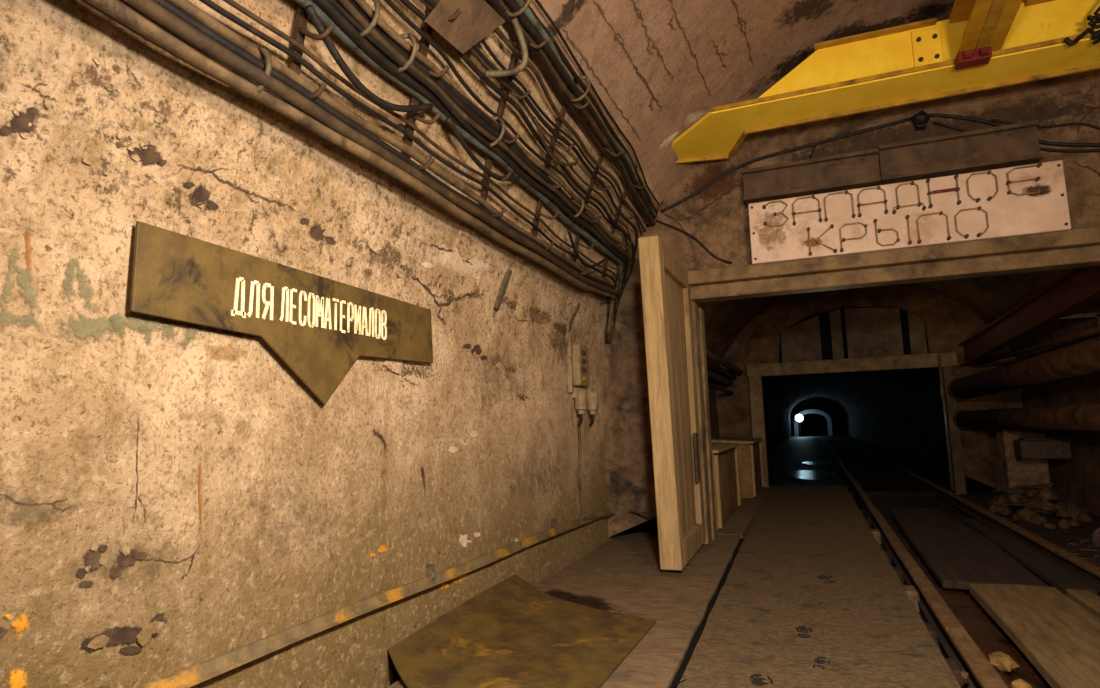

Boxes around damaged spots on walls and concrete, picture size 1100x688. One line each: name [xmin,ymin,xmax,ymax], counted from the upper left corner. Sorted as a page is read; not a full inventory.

damp [778,0,834,30]
damp [825,20,872,40]
damp [906,3,950,20]
crack [562,0,754,142]
spalling [0,107,39,138]
spalling [112,132,167,166]
spalling [184,181,219,210]
crack [178,164,291,207]
spalling [76,544,147,587]
rust [5,614,29,636]
spalling [81,613,168,654]
rust [9,669,27,688]